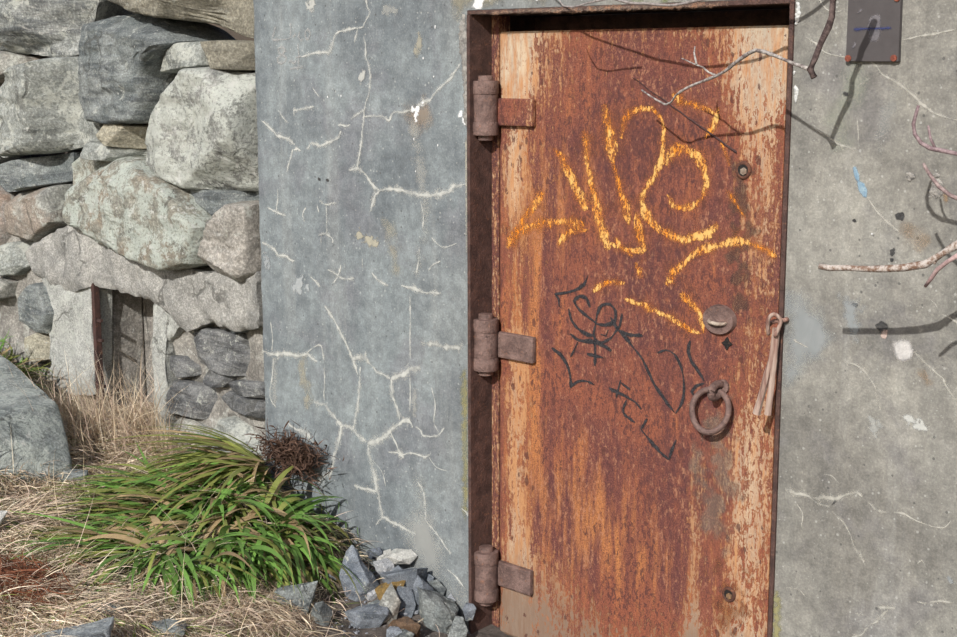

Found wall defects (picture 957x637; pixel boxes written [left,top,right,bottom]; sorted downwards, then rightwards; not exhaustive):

crack [262,0,464,586]
leakage [453,0,494,9]